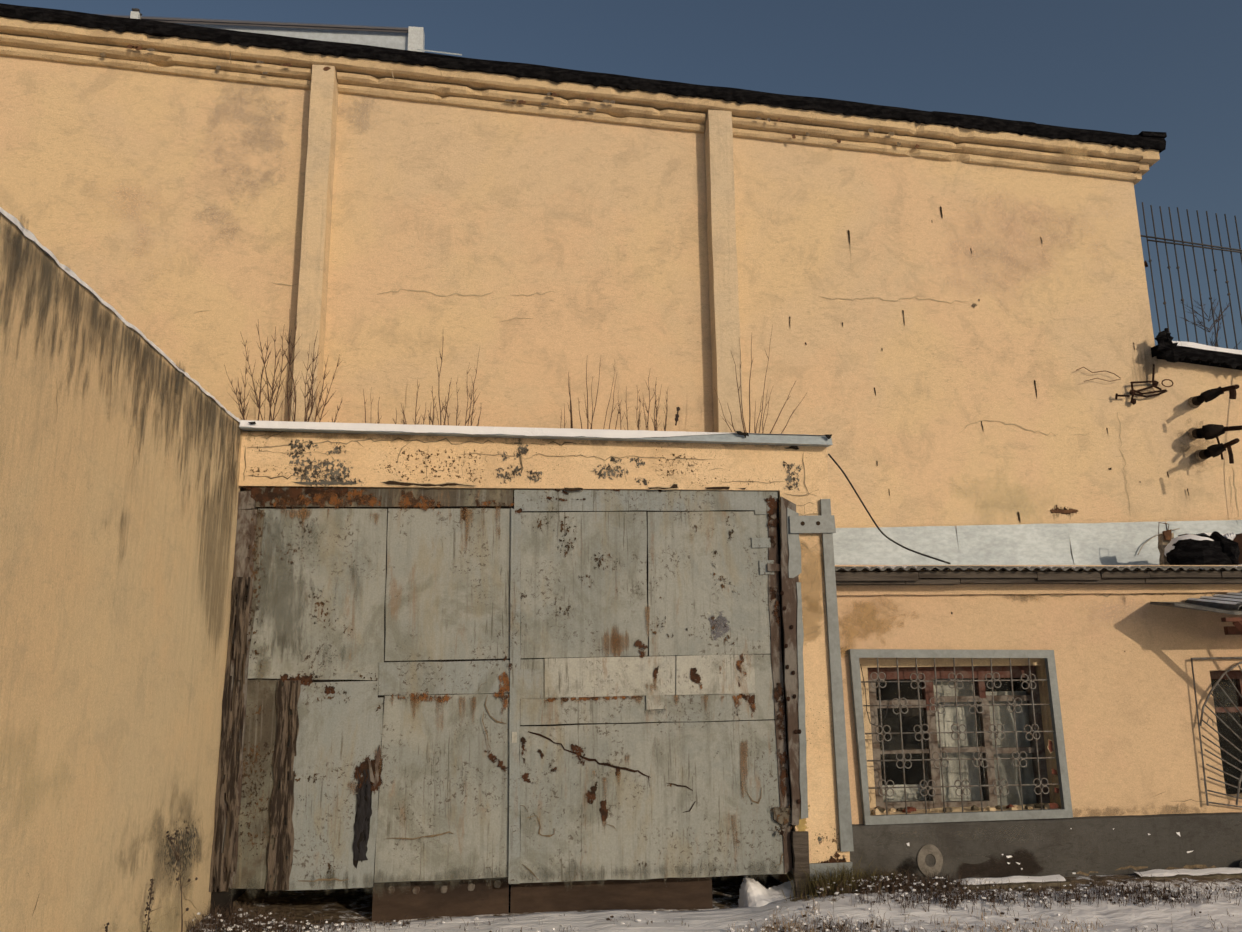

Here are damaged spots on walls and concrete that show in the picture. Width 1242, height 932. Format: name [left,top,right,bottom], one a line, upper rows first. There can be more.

water stain [1,217,242,491]
peeling [246,439,362,488]
flaking render [374,443,542,488]
peeling [591,445,802,492]
rust [243,486,382,524]
rust [1050,505,1079,515]
rust [547,666,659,703]
rust [686,654,756,716]
rust [348,750,384,794]
rust [520,737,557,783]
crack [478,682,696,813]
rust [585,755,629,825]